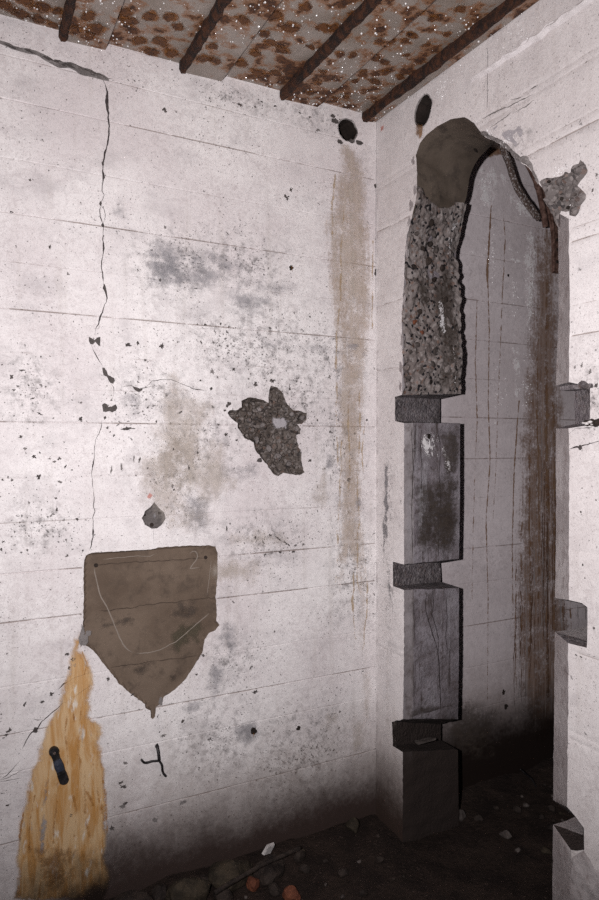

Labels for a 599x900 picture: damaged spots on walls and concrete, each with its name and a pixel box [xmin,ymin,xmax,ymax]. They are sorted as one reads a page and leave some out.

corrosion [0,0,108,40]
corrosion [119,8,183,31]
corrosion [133,37,178,58]
corrosion [235,31,290,77]
corrosion [268,12,301,33]
corrosion [351,31,431,85]
spalling [481,97,599,228]
spalling [399,185,466,395]
leakage [328,147,374,563]
spalling [212,379,318,476]
peeling [142,502,166,534]
corrosion [15,624,109,900]